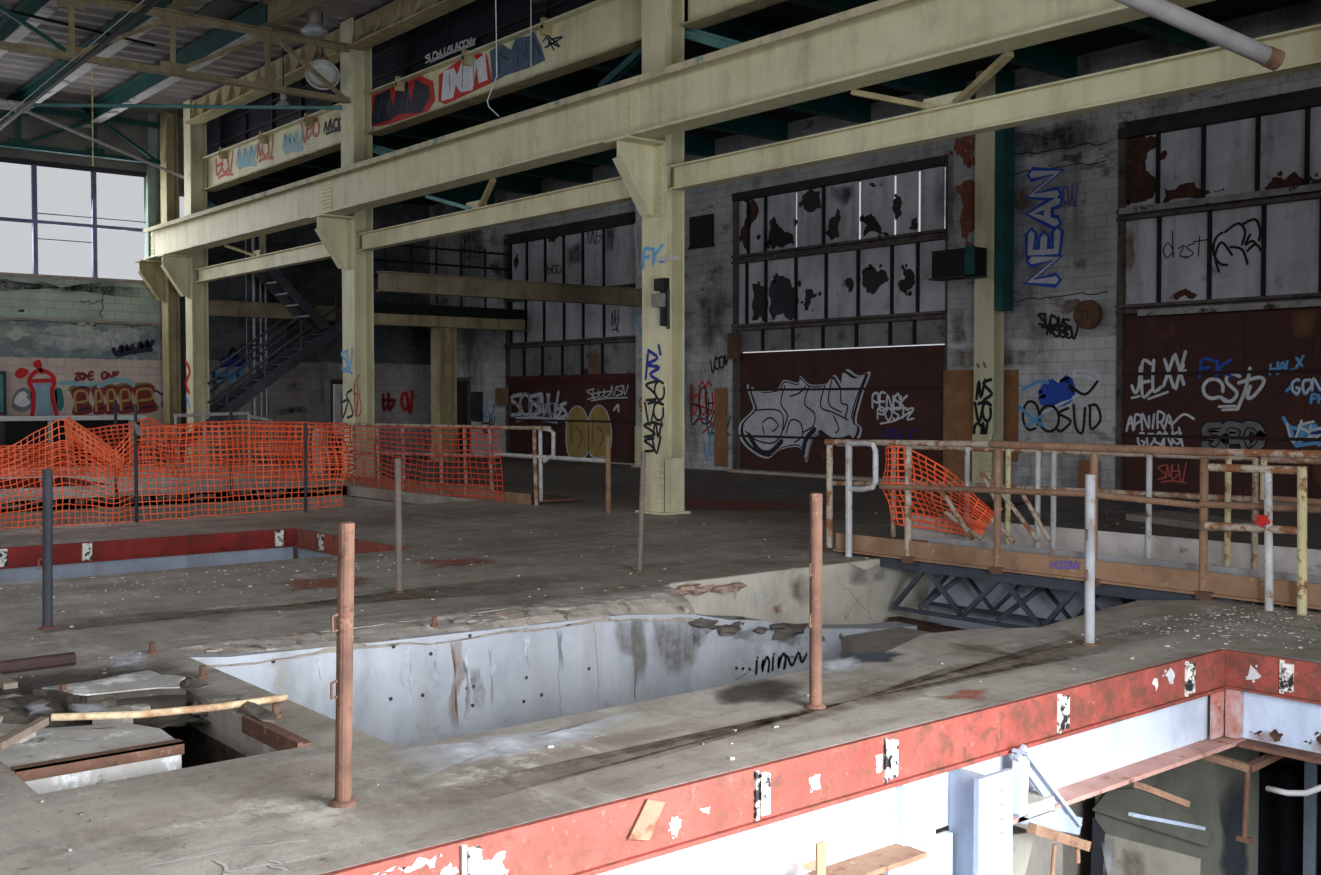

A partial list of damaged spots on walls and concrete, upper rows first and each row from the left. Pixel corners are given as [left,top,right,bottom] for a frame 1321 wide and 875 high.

damp [622,627,708,674]
damp [822,642,899,670]
damp [433,653,476,716]
damp [720,637,805,703]
peeling [1152,668,1175,690]
peeling [1246,665,1261,683]
damp [430,721,591,762]
peeling [875,754,883,773]
peeling [808,774,821,793]
peeling [668,816,681,839]
peeling [374,854,459,875]
peeling [482,851,508,875]